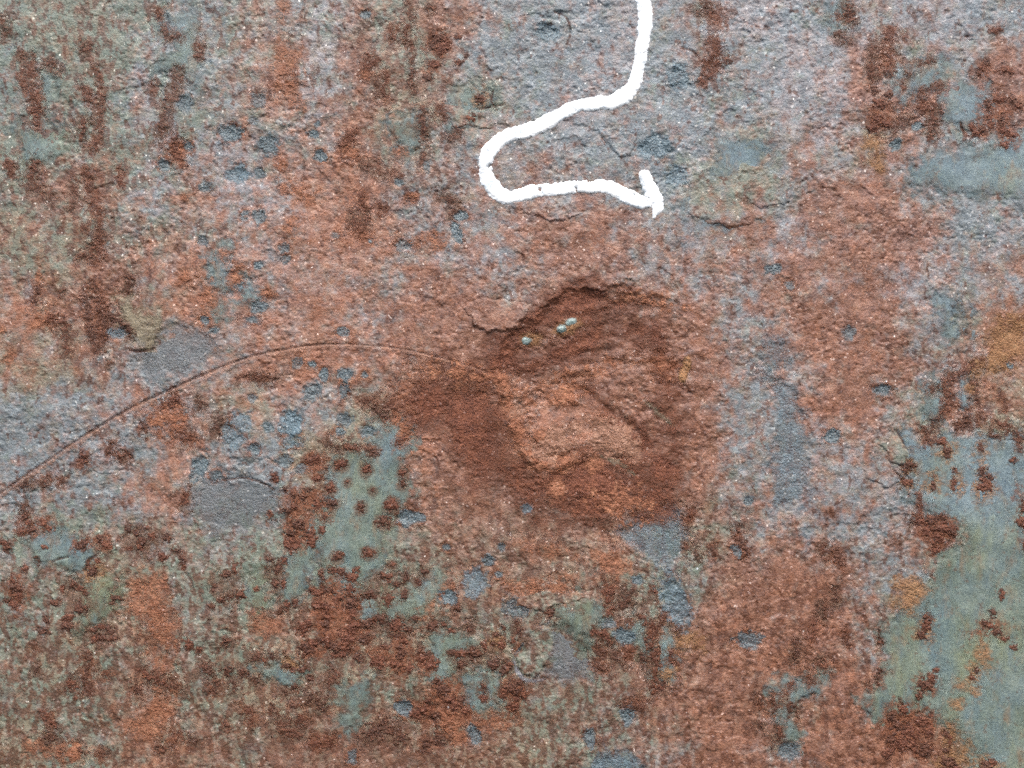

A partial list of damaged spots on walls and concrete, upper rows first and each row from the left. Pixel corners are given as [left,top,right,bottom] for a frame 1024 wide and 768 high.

corrosion [408,31,469,94]
corrosion [864,60,907,172]
corrosion [969,94,1024,149]
corrosion [401,352,683,498]
corrosion [902,314,1024,554]
corrosion [0,503,56,617]
corrosion [29,534,113,647]
corrosion [108,524,186,642]
corrosion [182,439,528,753]
corrosion [590,551,703,695]
corrosion [956,588,1018,696]
corrosion [881,667,968,768]